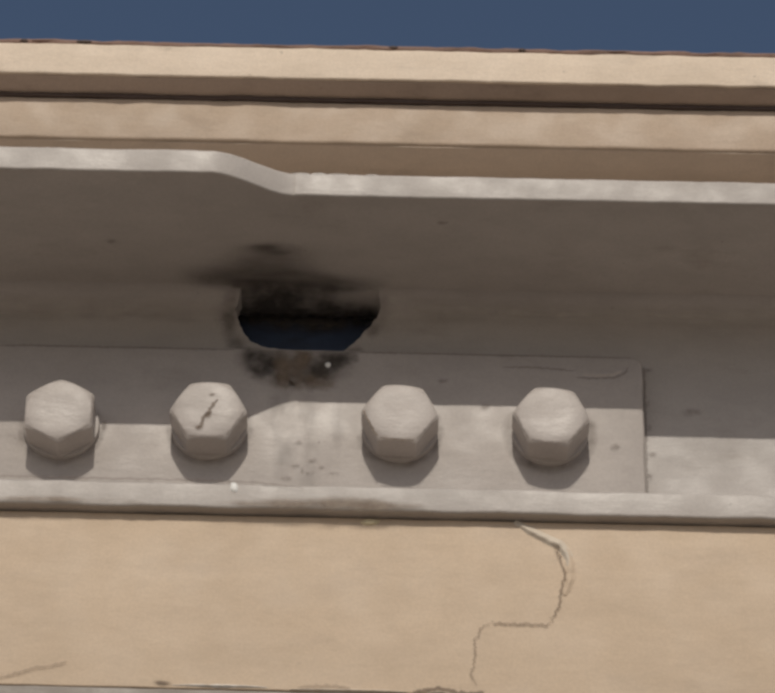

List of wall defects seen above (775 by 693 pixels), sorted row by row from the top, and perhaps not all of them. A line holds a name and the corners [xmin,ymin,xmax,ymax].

water stain [240,285,377,318]
water stain [311,354,347,378]
crack [492,549,566,626]